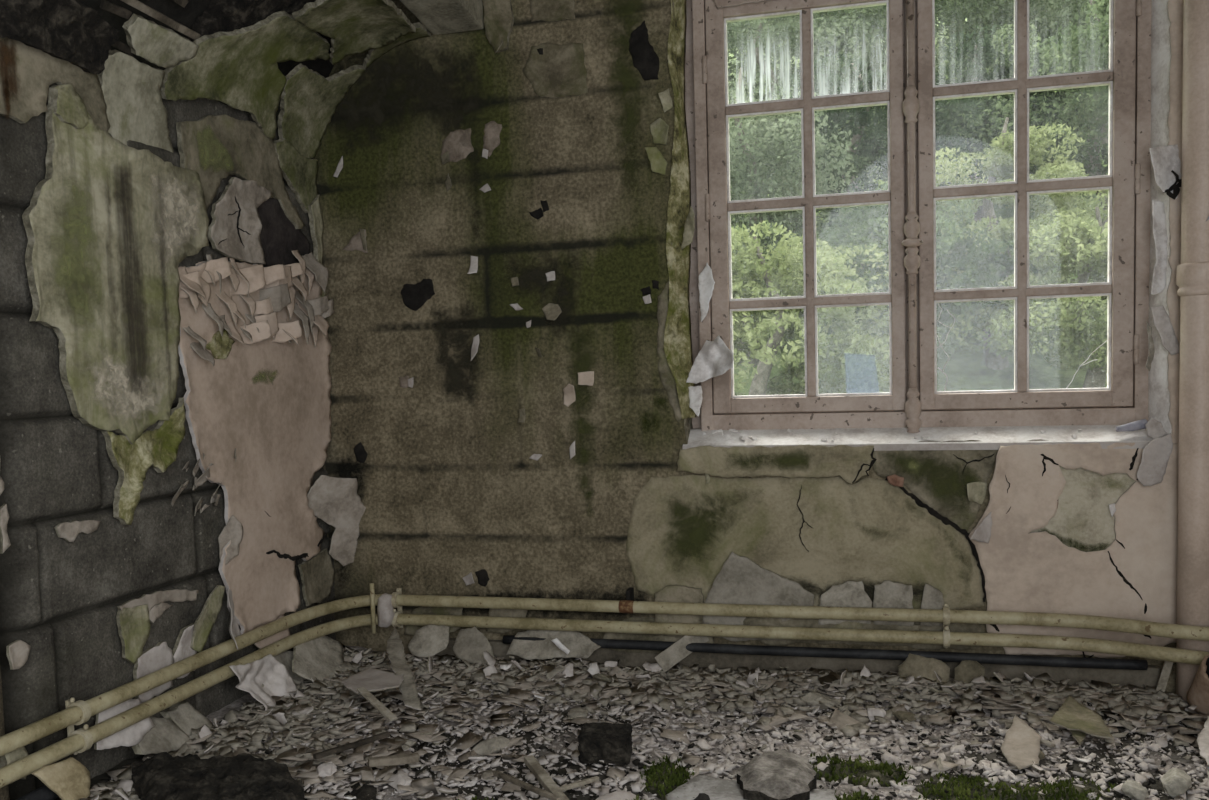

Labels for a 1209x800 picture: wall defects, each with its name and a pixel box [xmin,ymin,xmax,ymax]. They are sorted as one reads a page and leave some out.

spalling [529,200,549,220]
spalling [629,0,734,422]
damp [97,285,154,414]
flaking render [0,38,368,711]
flaking render [563,371,594,407]
peeling [677,0,1184,658]
crack [852,448,999,632]
crack [1108,539,1151,639]